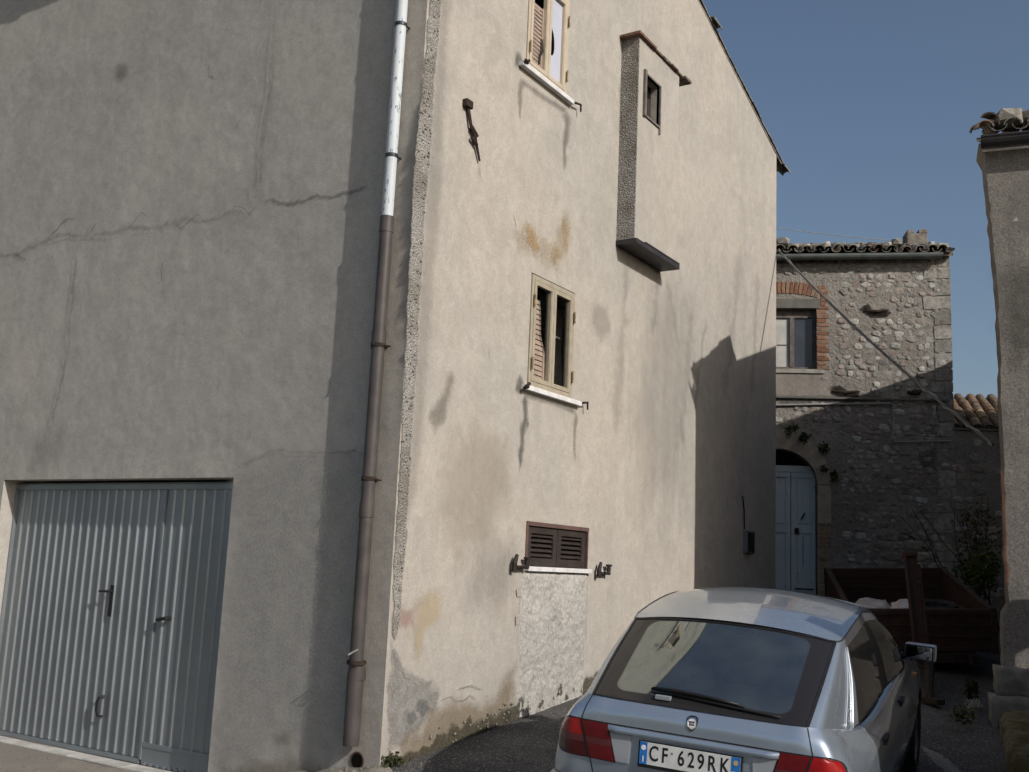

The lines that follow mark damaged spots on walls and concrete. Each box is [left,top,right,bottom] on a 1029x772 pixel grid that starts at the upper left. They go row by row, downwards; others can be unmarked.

leakage [396,671,598,765]